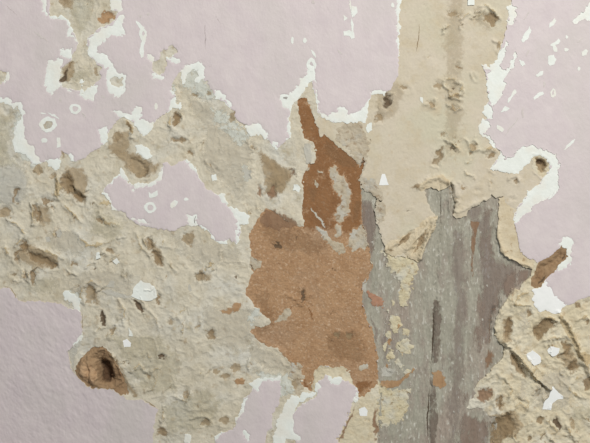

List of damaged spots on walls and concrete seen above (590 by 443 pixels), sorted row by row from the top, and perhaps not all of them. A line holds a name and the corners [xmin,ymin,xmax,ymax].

spalling [41,0,126,101]
spalling [0,58,380,443]
spalling [314,0,590,443]